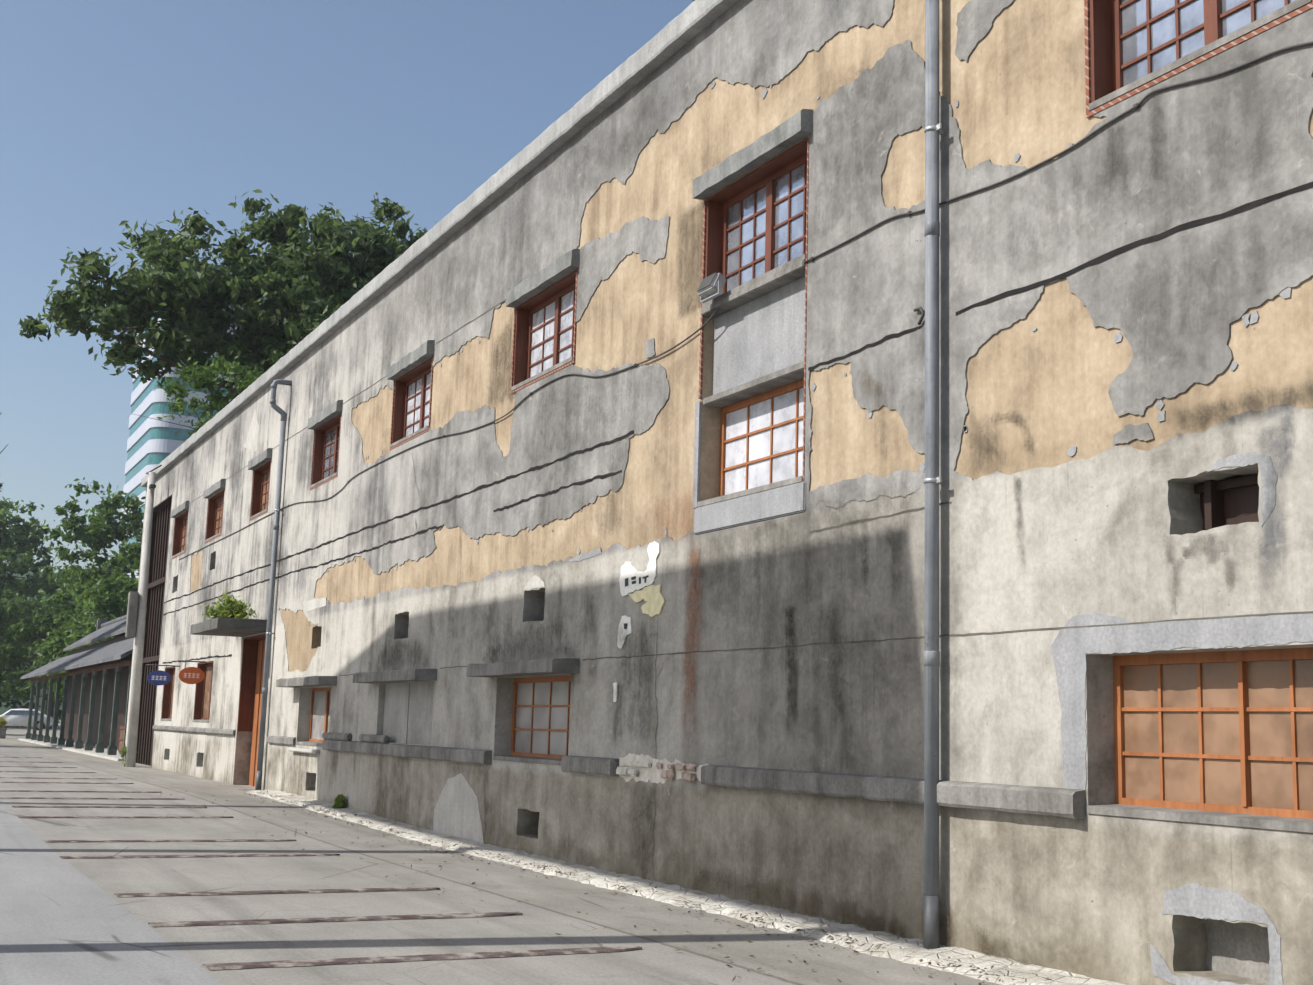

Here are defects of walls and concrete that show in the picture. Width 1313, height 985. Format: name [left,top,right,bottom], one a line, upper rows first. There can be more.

peeling [315,0,1106,649]
peeling [955,276,1313,480]
peeling [280,608,322,672]
peeling [616,760,696,781]